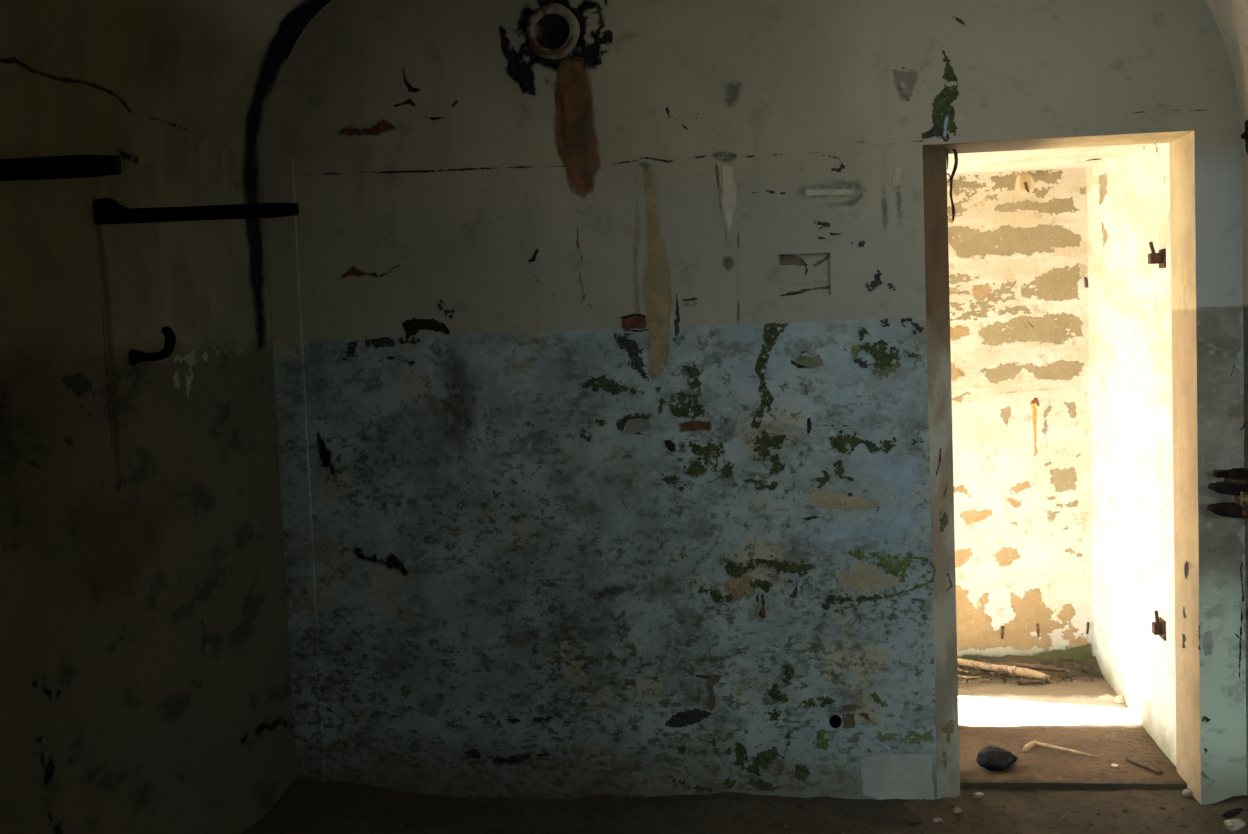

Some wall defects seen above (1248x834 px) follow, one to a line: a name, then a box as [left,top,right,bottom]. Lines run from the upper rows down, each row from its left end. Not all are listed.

corrosion [546,59,600,197]
spalling [947,169,1107,259]
spalling [949,263,1084,384]
spalling [1001,406,1011,425]
corrosion [1031,397,1040,456]
spalling [1042,401,1077,435]
spalling [954,485,992,525]
spalling [1007,481,1031,526]
spalling [1044,453,1081,530]
spalling [955,548,973,568]
spalling [994,547,1020,567]
spalling [956,585,1088,651]